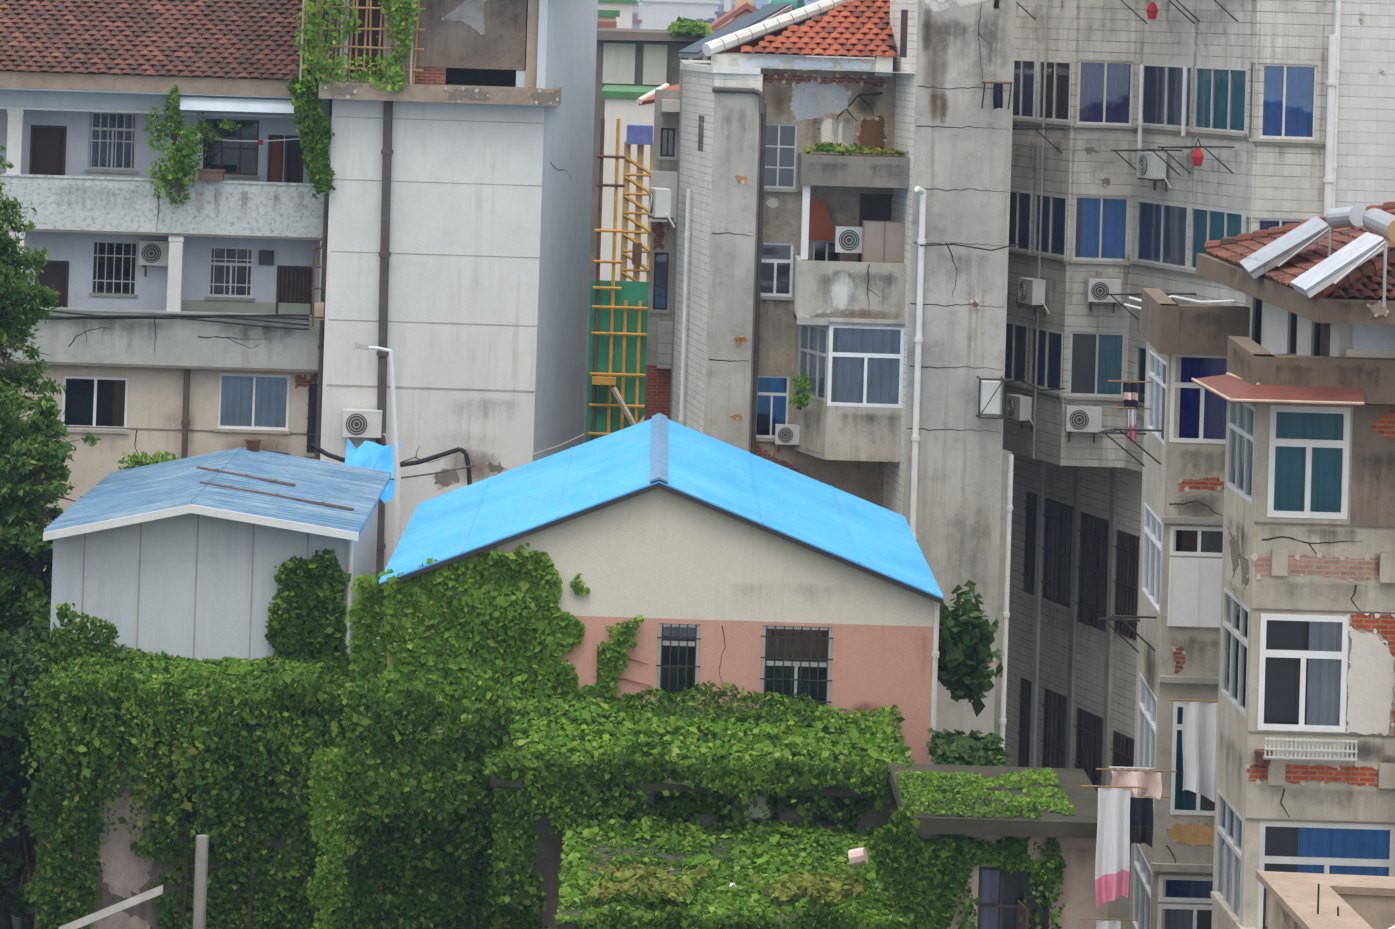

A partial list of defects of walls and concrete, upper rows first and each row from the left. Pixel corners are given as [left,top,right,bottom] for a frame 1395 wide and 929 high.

flaking render [1371,410,1395,443]
flaking render [1178,475,1225,492]
crack [1169,501,1361,607]
flaking render [1229,531,1380,590]
flaking render [1347,610,1395,735]
flaking render [1245,764,1268,785]
flaking render [1285,761,1379,787]